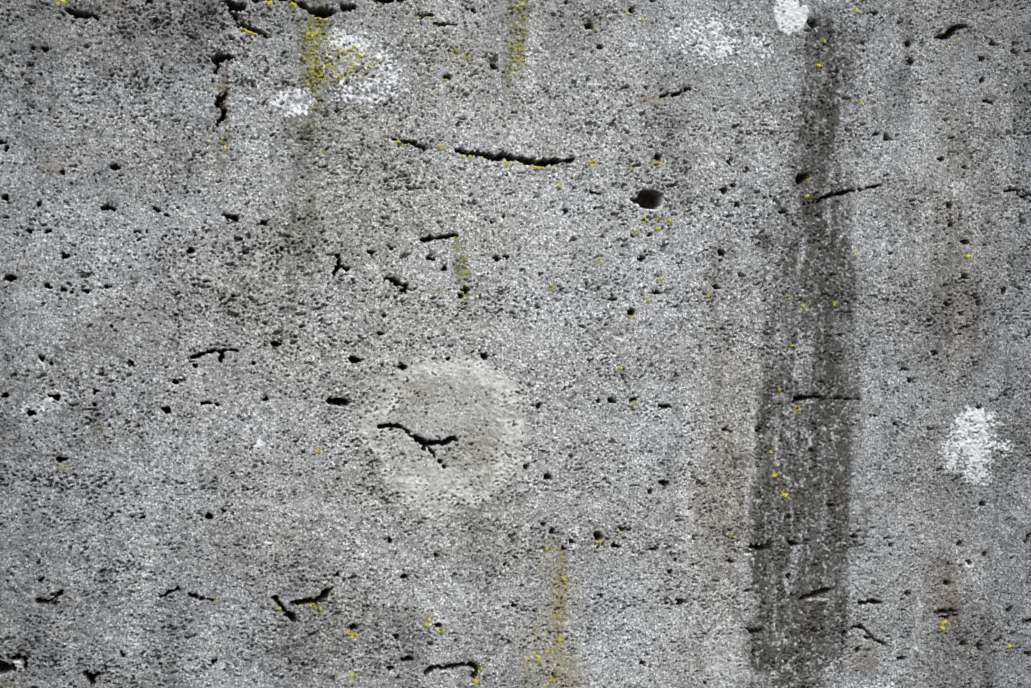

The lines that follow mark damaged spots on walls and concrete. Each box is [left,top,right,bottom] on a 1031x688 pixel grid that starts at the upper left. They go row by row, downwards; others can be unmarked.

leakage [269,19,411,118]
leakage [663,10,778,71]
crack [390,137,427,152]
crack [454,148,575,167]
leakage [740,20,871,688]
crack [377,422,459,469]